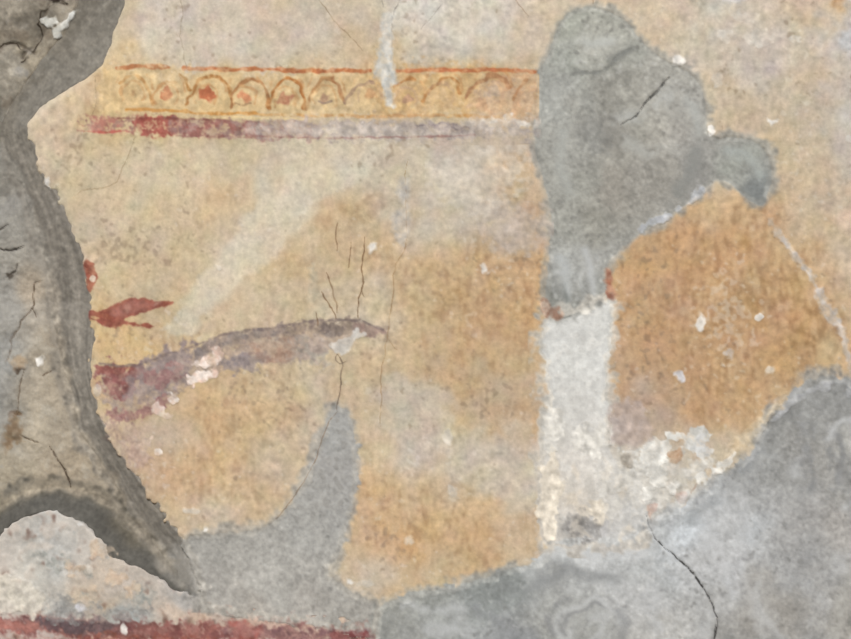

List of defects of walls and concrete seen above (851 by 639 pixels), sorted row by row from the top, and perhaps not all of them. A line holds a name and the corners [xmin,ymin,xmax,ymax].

crack [620,76,670,125]
peeling [671,54,687,67]
peeling [706,124,717,138]
crack [315,222,365,326]
crack [379,242,407,427]
peeling [671,366,686,384]
peeling [533,403,739,543]
crack [657,541,718,639]